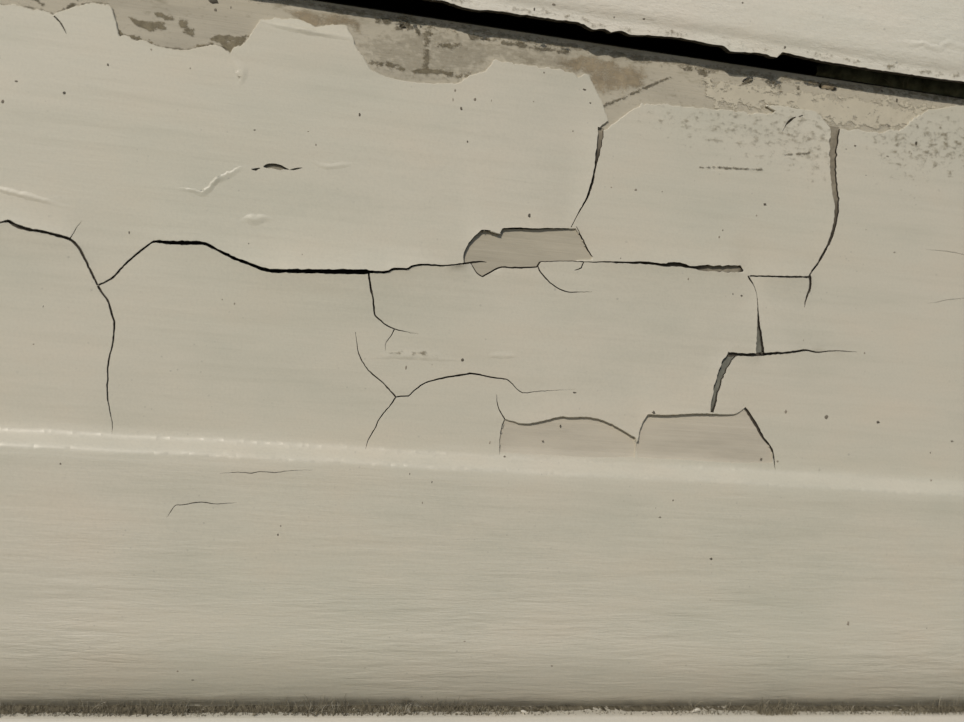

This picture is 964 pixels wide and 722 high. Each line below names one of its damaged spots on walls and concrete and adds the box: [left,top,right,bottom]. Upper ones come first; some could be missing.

peeling [0,0,964,133]
peeling [464,229,591,276]
crack [0,126,851,445]
peeling [500,409,772,463]
crack [744,408,772,452]